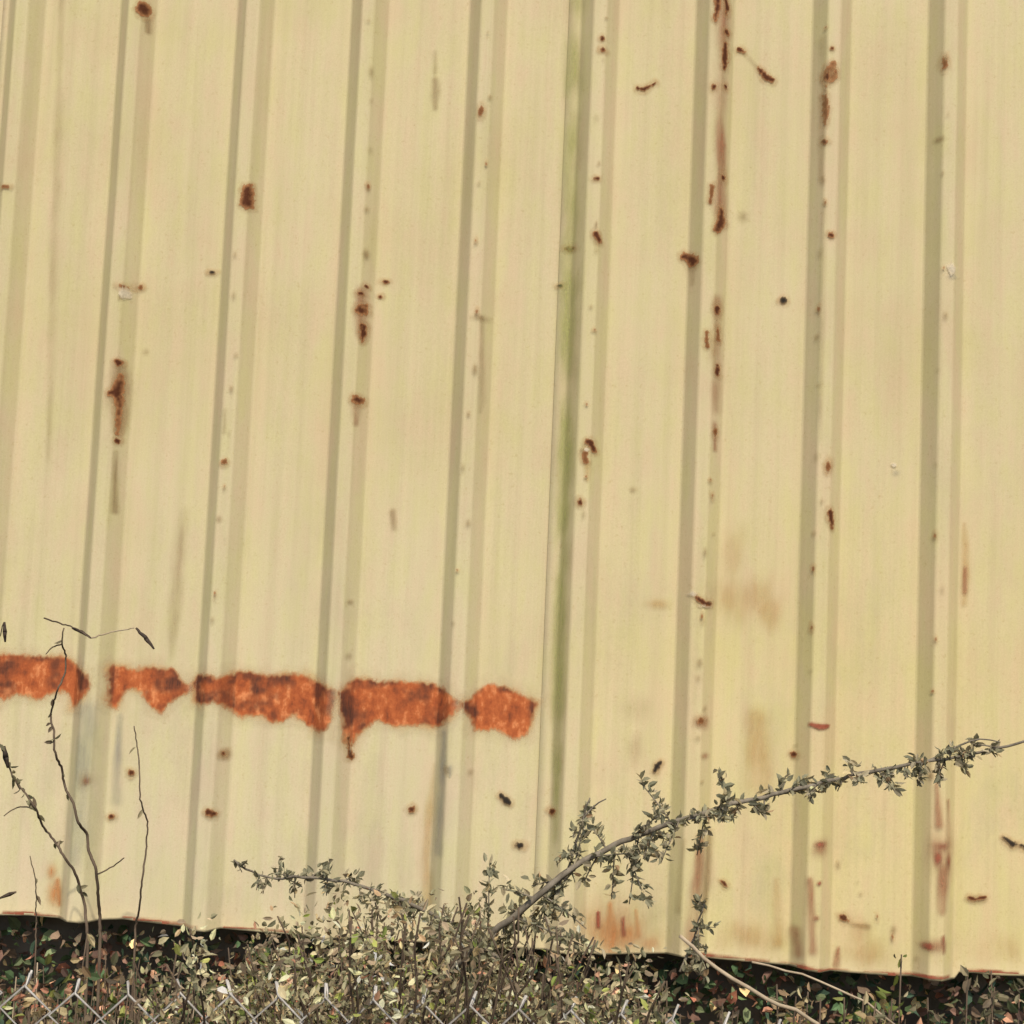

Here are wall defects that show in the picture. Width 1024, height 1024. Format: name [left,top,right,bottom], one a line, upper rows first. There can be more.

rust [135,0,152,17]
rust [713,0,730,71]
rust [821,46,838,125]
rust [239,183,256,210]
rust [708,131,726,234]
rust [680,251,699,268]
rust [354,280,390,343]
rust [107,359,126,444]
rust [582,438,597,478]
rust [0,652,91,710]
rust [104,664,539,760]